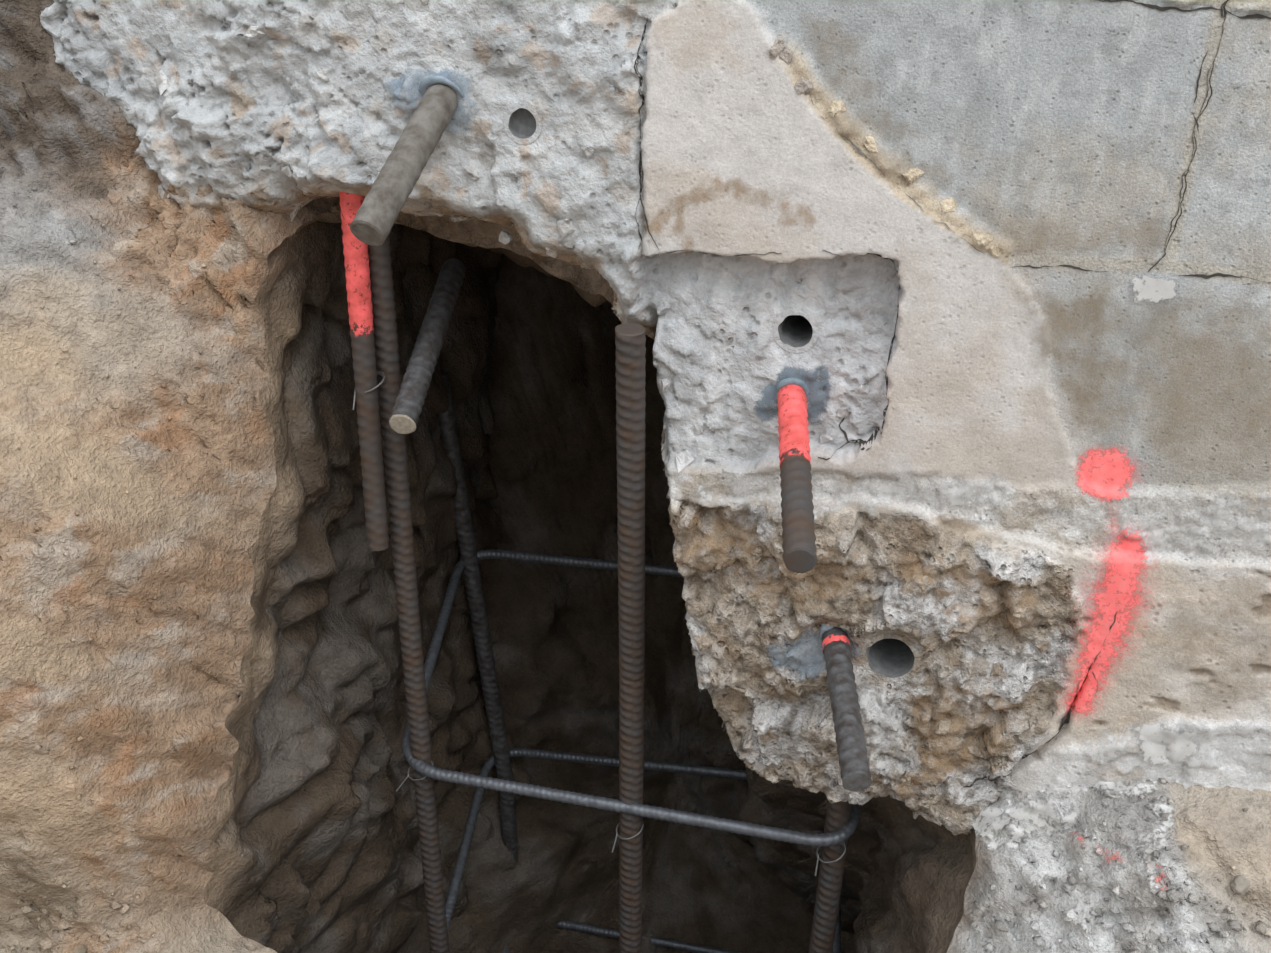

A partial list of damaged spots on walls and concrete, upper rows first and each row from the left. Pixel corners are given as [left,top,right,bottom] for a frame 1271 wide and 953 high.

spalling [40,0,678,327]
crack [634,17,782,256]
peeling [769,38,793,64]
peeling [821,99,999,258]
crack [1010,0,1271,283]
spalling [389,223,622,663]
spalling [203,212,430,953]
spalling [426,572,497,778]
spalling [478,559,620,800]
spalling [634,251,1085,953]
crack [964,611,1118,787]
spalling [434,779,620,953]